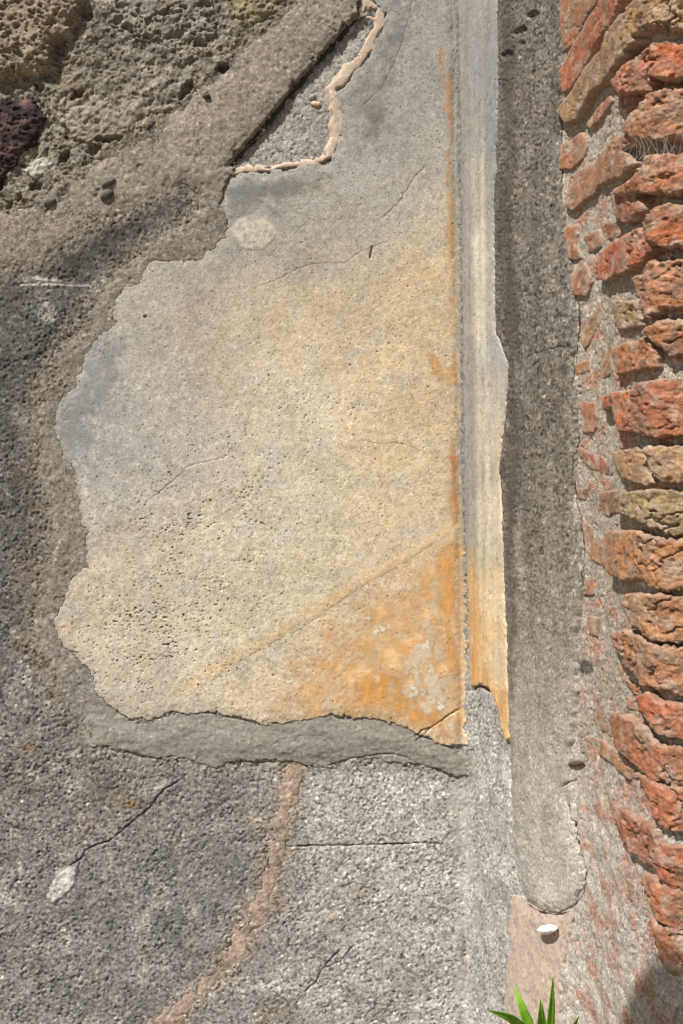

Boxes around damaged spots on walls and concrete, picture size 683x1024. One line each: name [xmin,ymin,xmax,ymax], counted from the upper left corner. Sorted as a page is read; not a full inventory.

spalling [236,20,368,167]
corrosion [300,547,503,737]
crack [68,745,190,874]
crack [287,840,430,848]